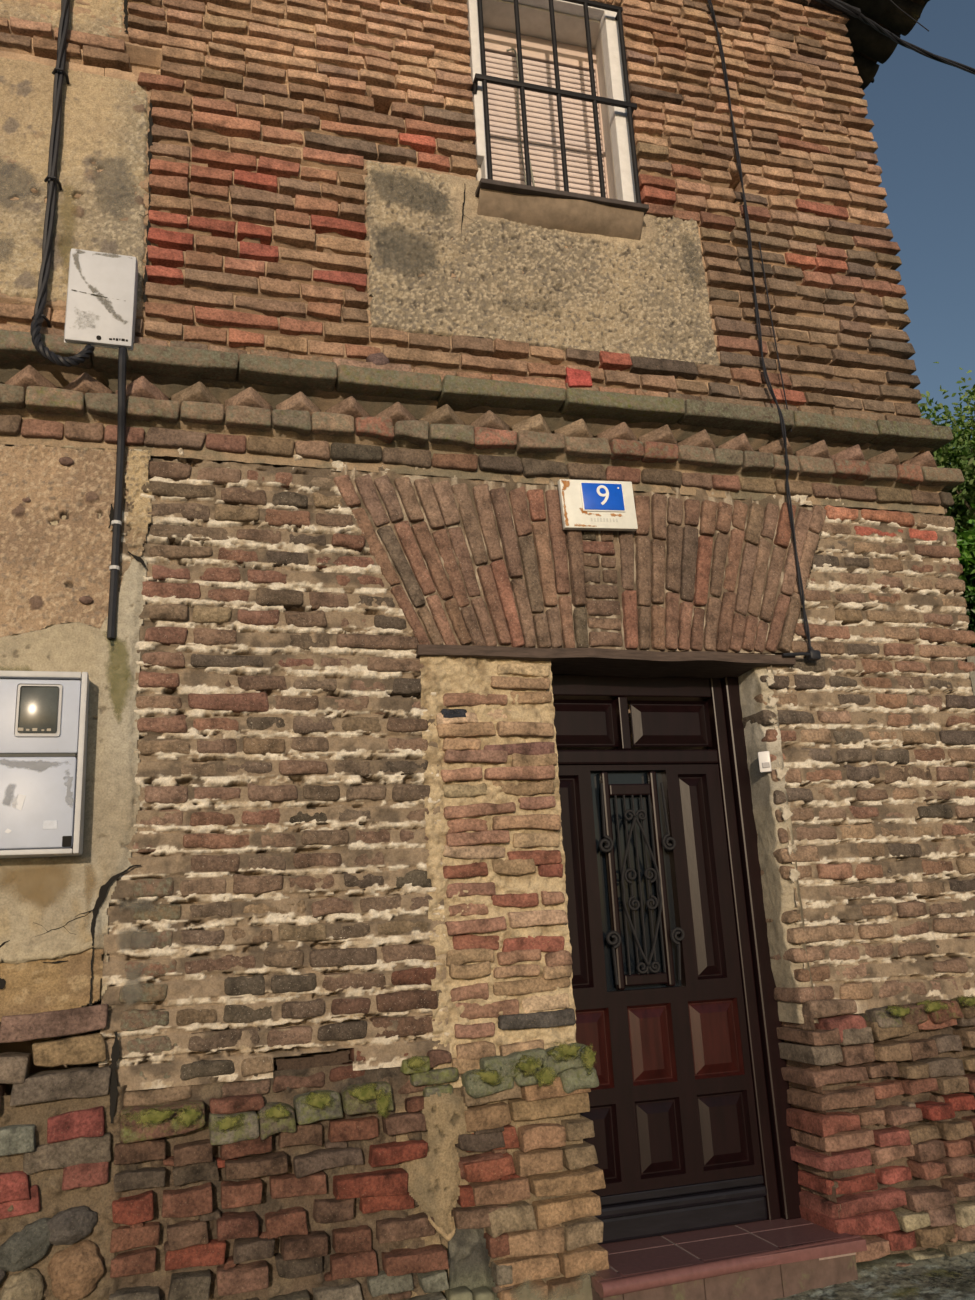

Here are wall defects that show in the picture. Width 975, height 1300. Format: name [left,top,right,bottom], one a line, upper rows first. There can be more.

leakage [373,173,447,213]
leakage [379,228,436,277]
crack [0,865,141,1006]